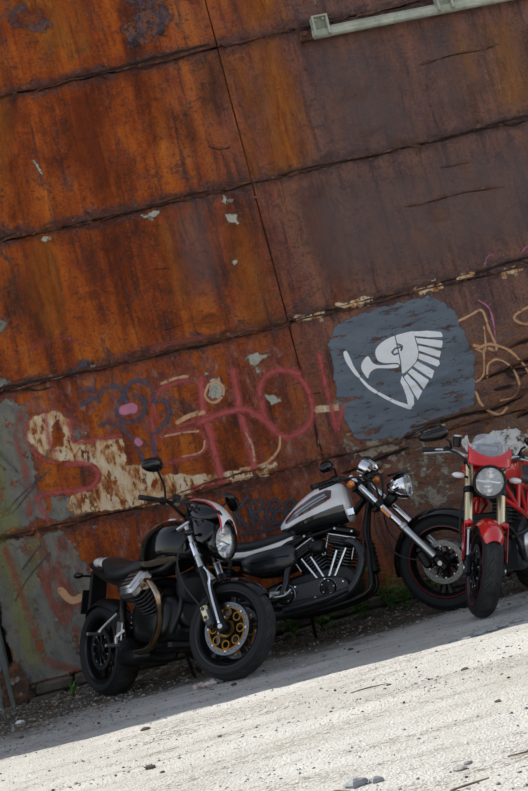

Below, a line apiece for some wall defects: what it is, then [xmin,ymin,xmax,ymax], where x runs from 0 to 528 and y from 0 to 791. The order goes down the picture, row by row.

rust [7,0,53,33]
rust [120,0,174,48]
crack [418,43,500,66]
crack [404,186,502,207]
peeling [501,265,525,279]
peeling [412,278,443,295]
peeling [335,296,375,308]
peeling [314,400,341,414]
peeling [461,426,528,455]
peeling [343,418,454,508]
peeling [0,341,283,708]